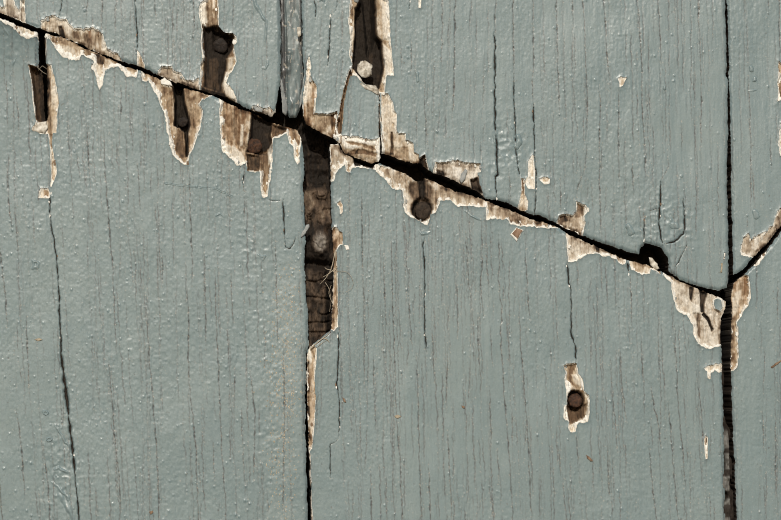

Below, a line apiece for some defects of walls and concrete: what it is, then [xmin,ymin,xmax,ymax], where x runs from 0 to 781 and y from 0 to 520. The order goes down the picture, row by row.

peeling [0,0,146,89]
peeling [157,66,237,107]
peeling [299,57,484,199]
crack [480,0,537,214]
crack [560,79,685,265]
crack [48,192,79,520]
peeling [305,344,317,520]
crack [330,332,340,474]
peeling [330,227,350,331]
crack [383,238,448,413]
crack [566,265,577,358]
peeling [548,201,781,379]